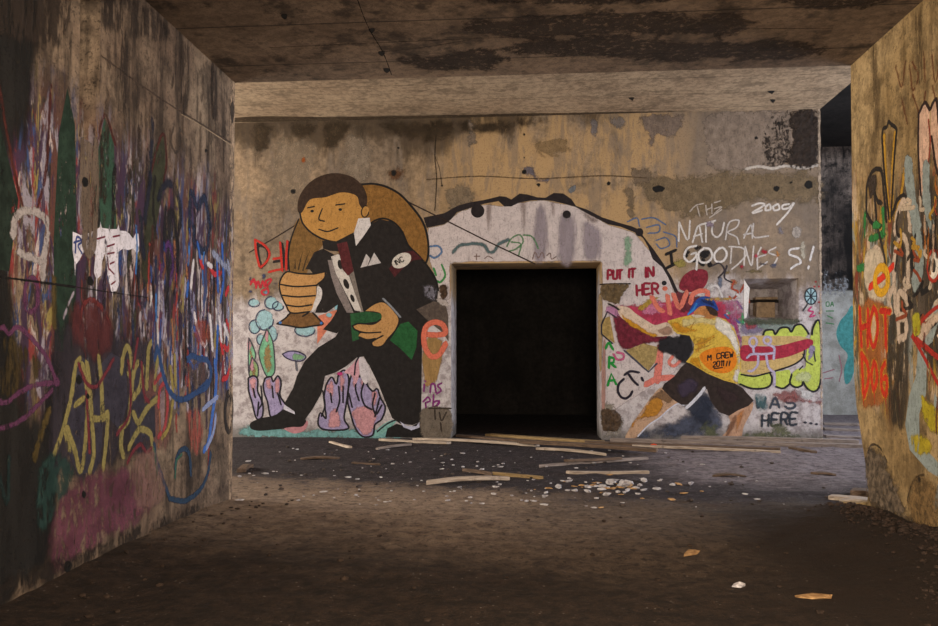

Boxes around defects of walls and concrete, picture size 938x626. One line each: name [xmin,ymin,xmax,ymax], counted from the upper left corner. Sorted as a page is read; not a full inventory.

damp [398,0,827,71]
damp [235,111,674,152]
peeling [445,185,474,210]
peeling [624,91,824,429]